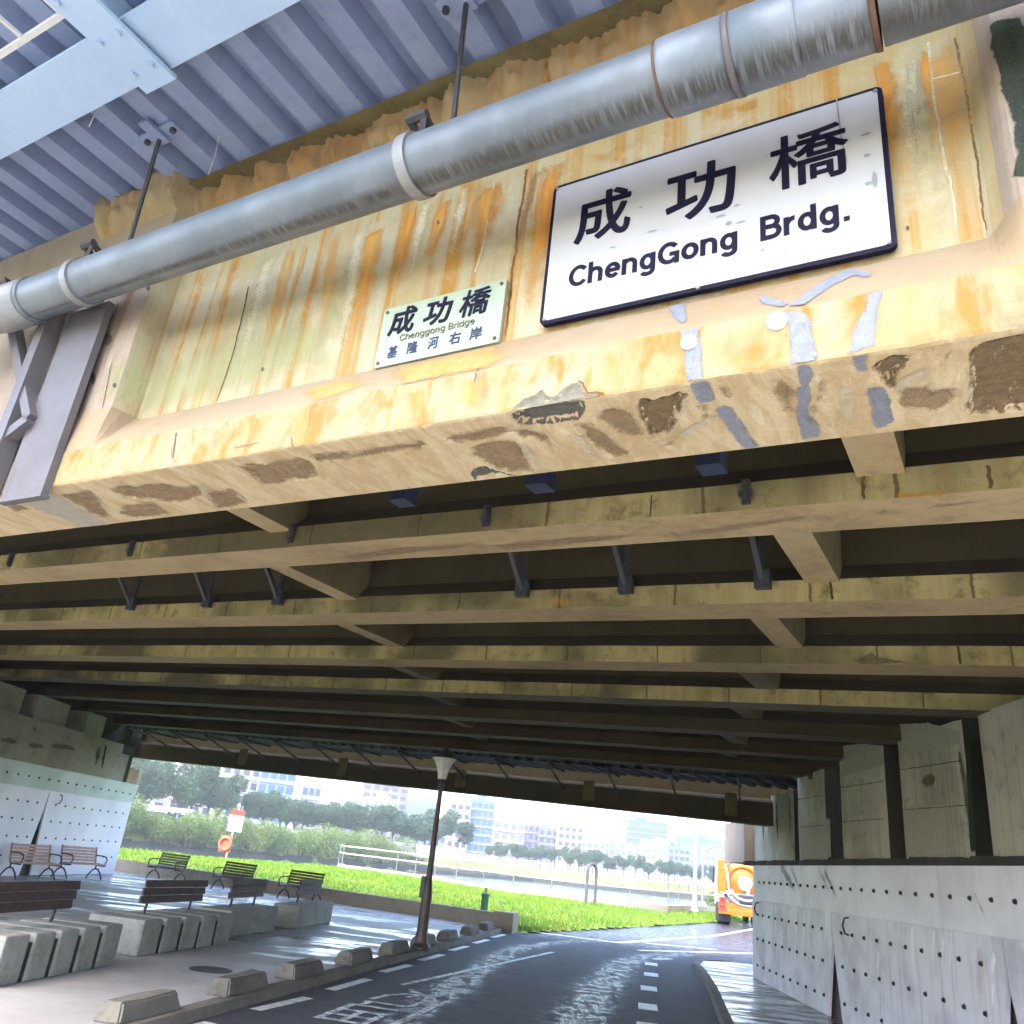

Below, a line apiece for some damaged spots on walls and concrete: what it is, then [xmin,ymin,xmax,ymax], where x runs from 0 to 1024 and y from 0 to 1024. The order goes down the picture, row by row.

crack [954,37,987,230]
crack [216,286,249,401]
rust [260,246,308,356]
rust [351,198,451,346]
rust [391,345,506,422]
rust [458,181,507,263]
crack [505,169,528,336]
rust [510,144,630,323]
spalling [446,383,709,481]
spalling [874,334,1024,414]
peeling [62,484,248,518]